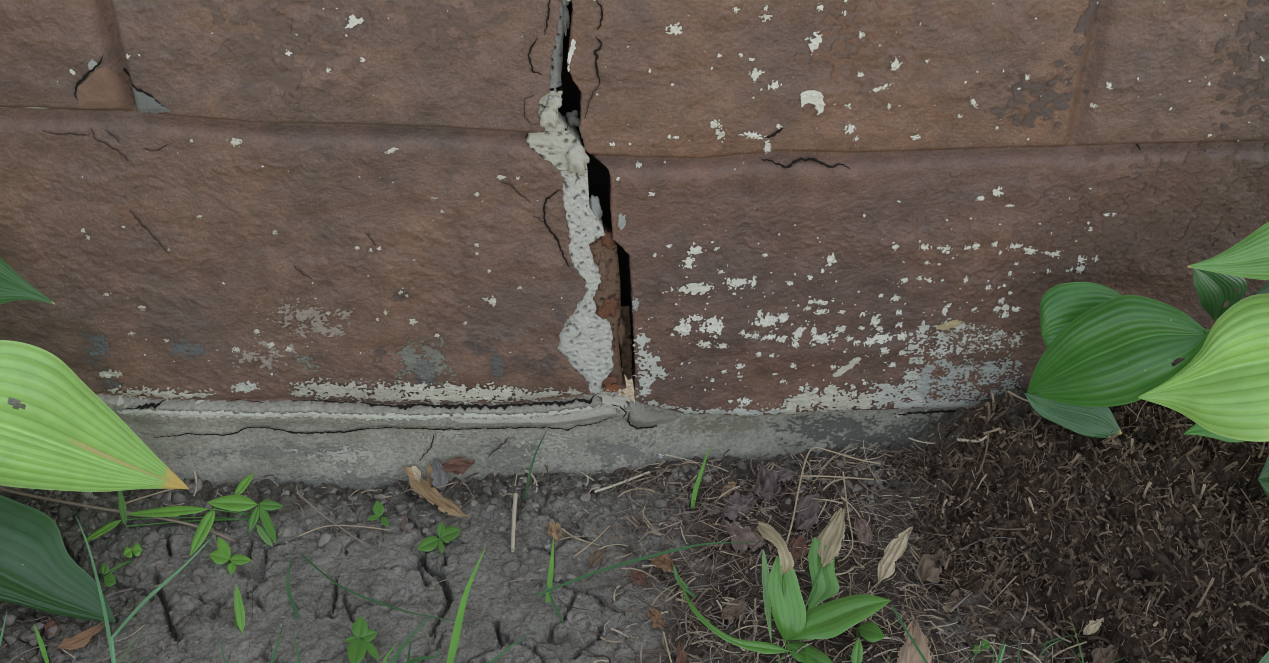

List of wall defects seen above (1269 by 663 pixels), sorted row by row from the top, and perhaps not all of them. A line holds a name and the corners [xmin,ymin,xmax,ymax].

peeling [132,87,171,114]
crack [762,126,850,169]
spalling [286,0,1064,417]
crack [125,0,657,461]
peeling [1066,255,1099,274]